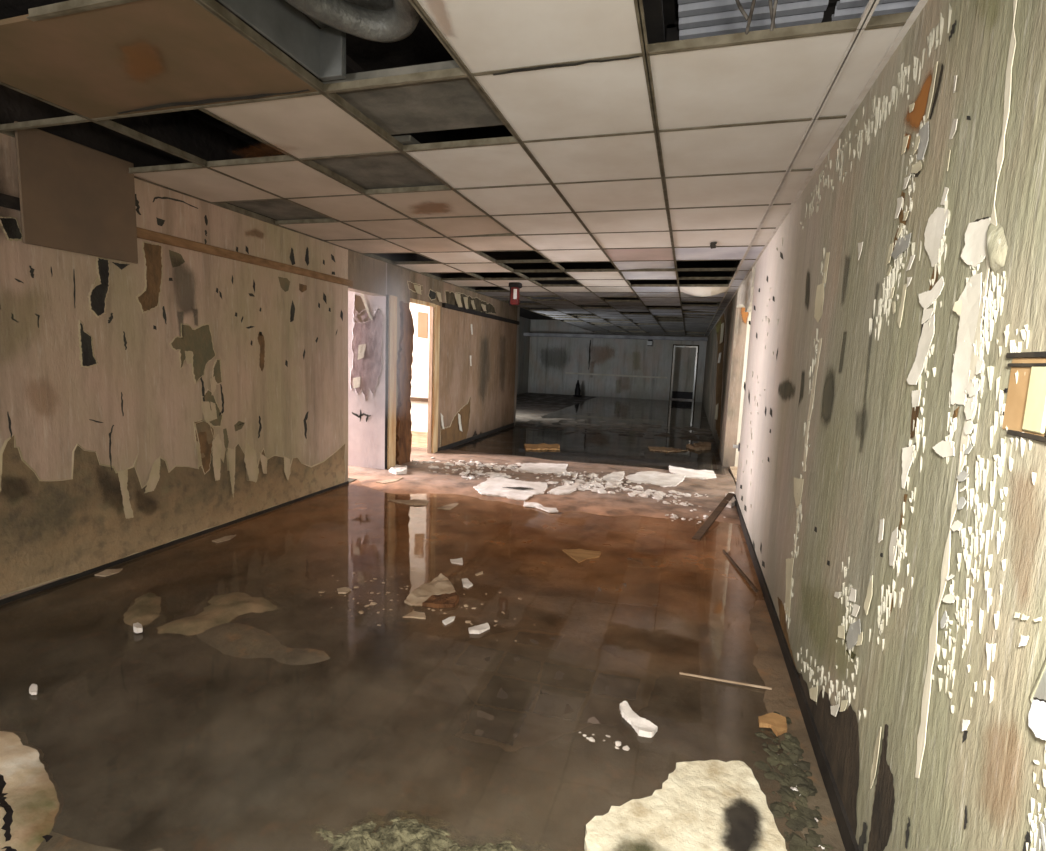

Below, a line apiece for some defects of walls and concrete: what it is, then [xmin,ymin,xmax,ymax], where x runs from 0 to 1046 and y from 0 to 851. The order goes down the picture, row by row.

peeling [0,215,23,241]
peeling [87,257,130,318]
peeling [136,241,185,314]
peeling [278,277,307,322]
peeling [290,247,309,266]
peeling [235,312,265,371]
peeling [318,292,385,401]
flaking render [396,280,496,465]
peeling [0,320,346,597]
peeling [777,3,1033,851]
peeling [1026,656,1046,851]